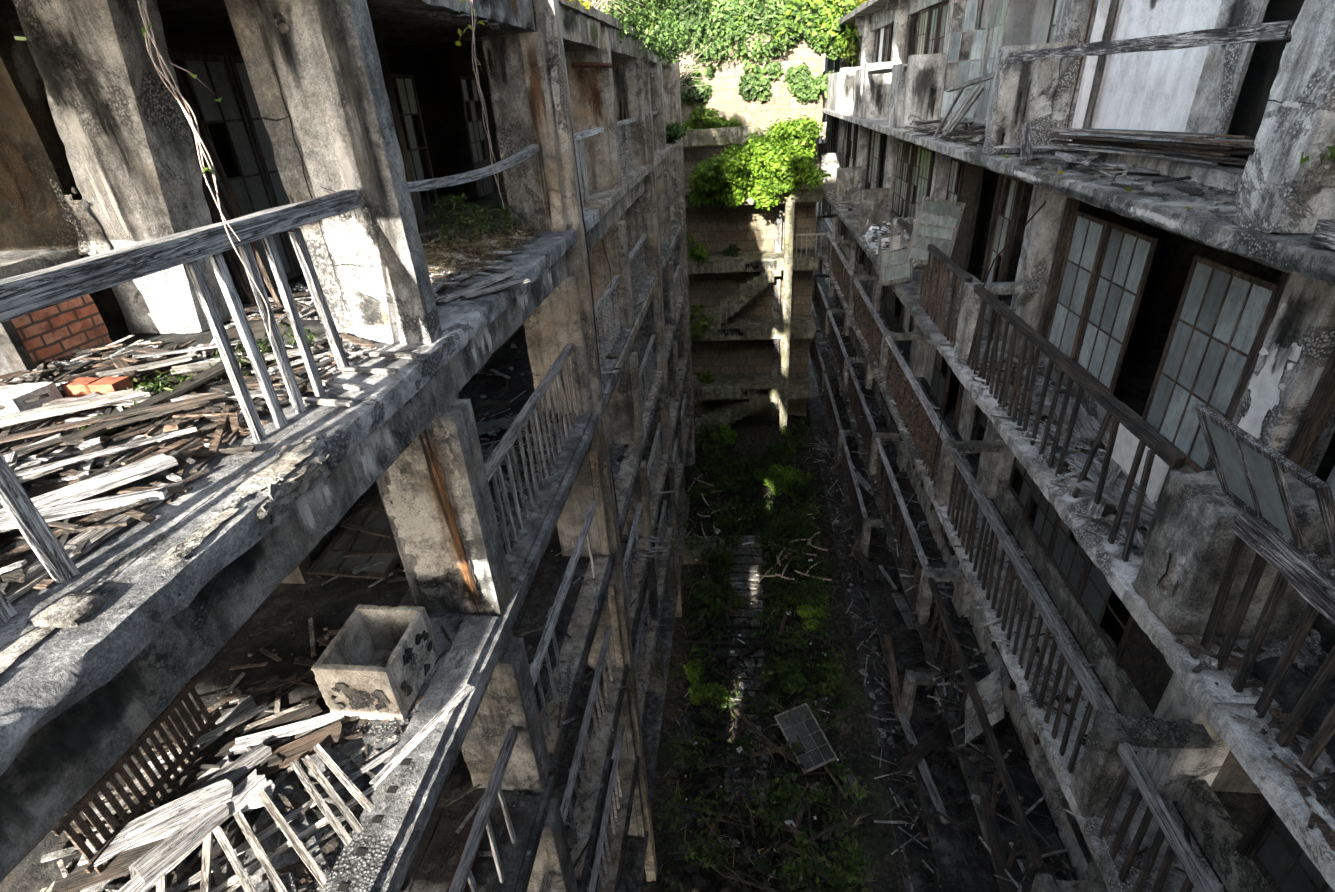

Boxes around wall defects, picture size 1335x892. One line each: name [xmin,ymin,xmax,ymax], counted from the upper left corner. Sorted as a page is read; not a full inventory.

leakage [11,11,129,168]
leakage [89,169,128,236]
peeling [1237,342,1302,439]
spalling [152,434,337,566]
rust [426,447,471,586]
leakage [0,666,144,843]